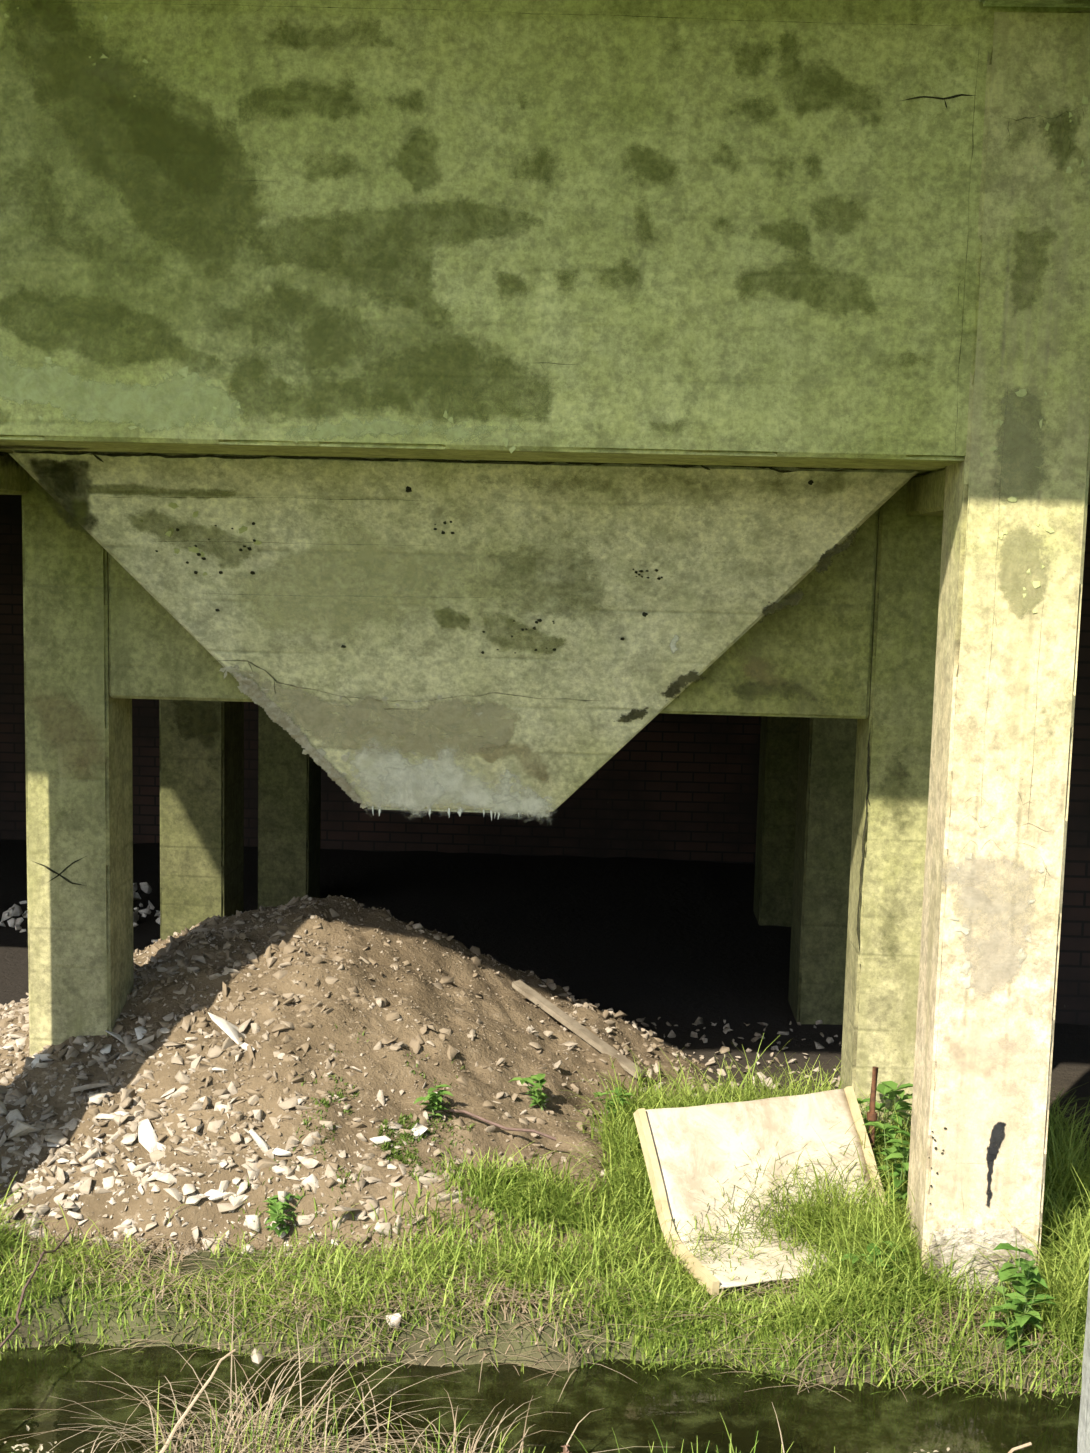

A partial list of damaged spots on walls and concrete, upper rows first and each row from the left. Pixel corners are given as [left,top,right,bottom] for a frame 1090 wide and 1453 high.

water stain [631,148,675,181]
crack [902,94,1035,155]
water stain [252,204,527,307]
water stain [0,446,230,530]
water stain [986,1122,1006,1207]